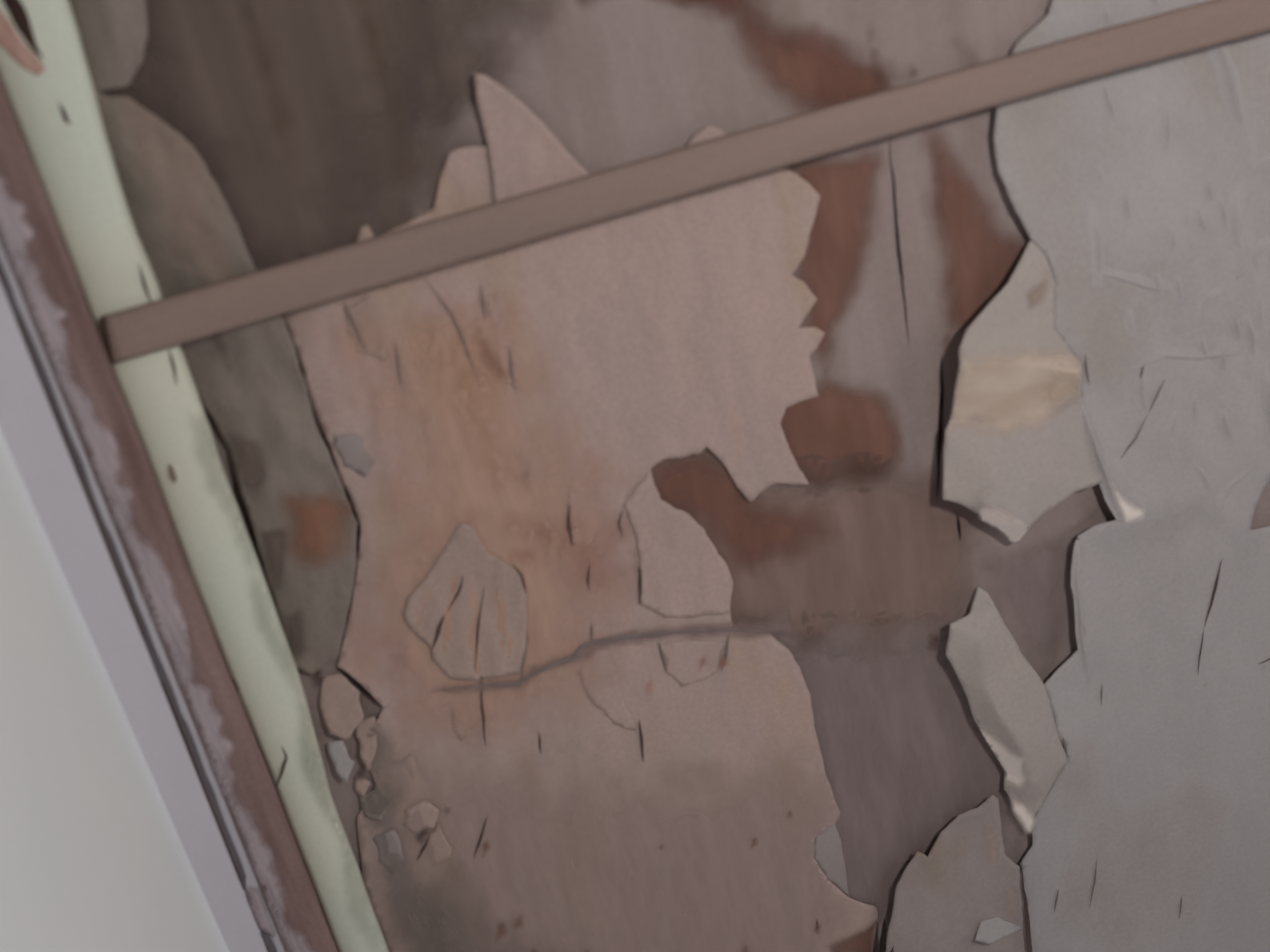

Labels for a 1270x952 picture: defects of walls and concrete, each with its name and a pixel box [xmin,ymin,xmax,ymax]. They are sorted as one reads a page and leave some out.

spalling [0,0,46,76]
peeling [1011,0,1196,54]
peeling [69,0,257,298]
peeling [356,73,589,242]
crack [890,149,909,341]
peeling [0,181,310,952]
peeling [180,167,878,952]
crack [567,506,590,592]
crack [428,565,789,744]
peeling [886,31,1270,952]